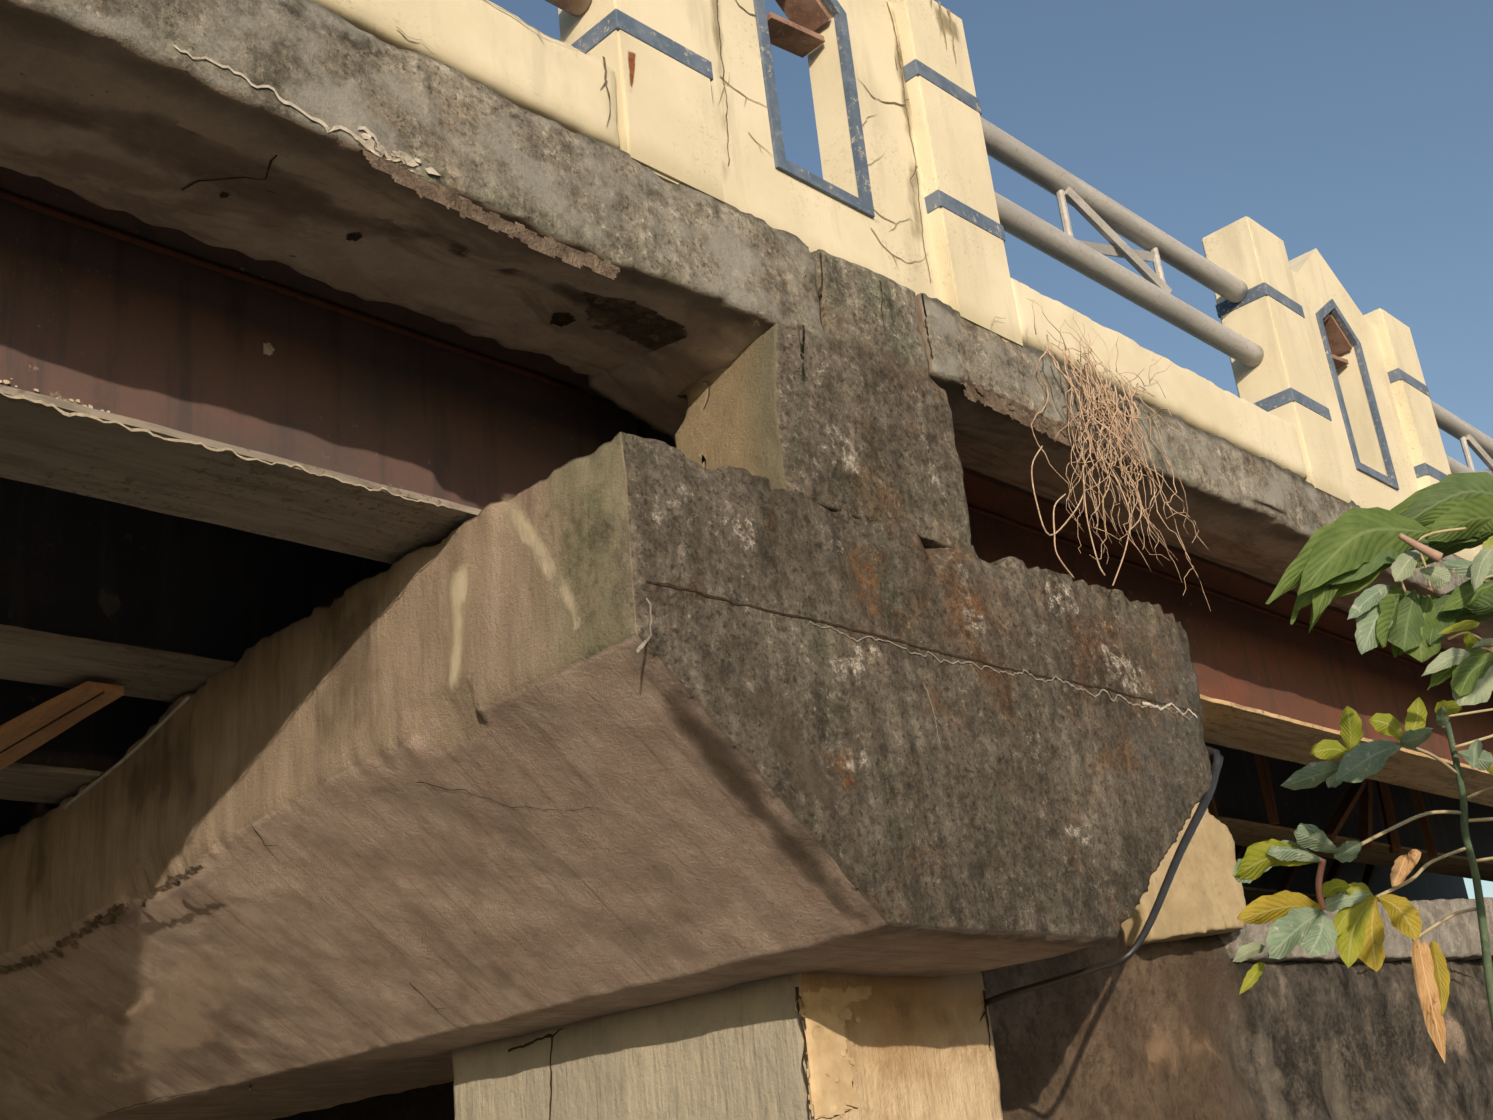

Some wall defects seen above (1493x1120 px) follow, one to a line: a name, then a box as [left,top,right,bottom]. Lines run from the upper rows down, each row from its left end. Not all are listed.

water stain [174,44,401,164]
crack [716,0,772,166]
water stain [931,0,957,59]
crack [181,155,281,196]
spalling [356,133,687,350]
crack [862,3,933,357]
water stain [615,317,686,351]
crack [646,580,1199,764]
crack [508,1028,563,1120]
crack [795,987,853,1120]
peeling [795,986,872,1119]